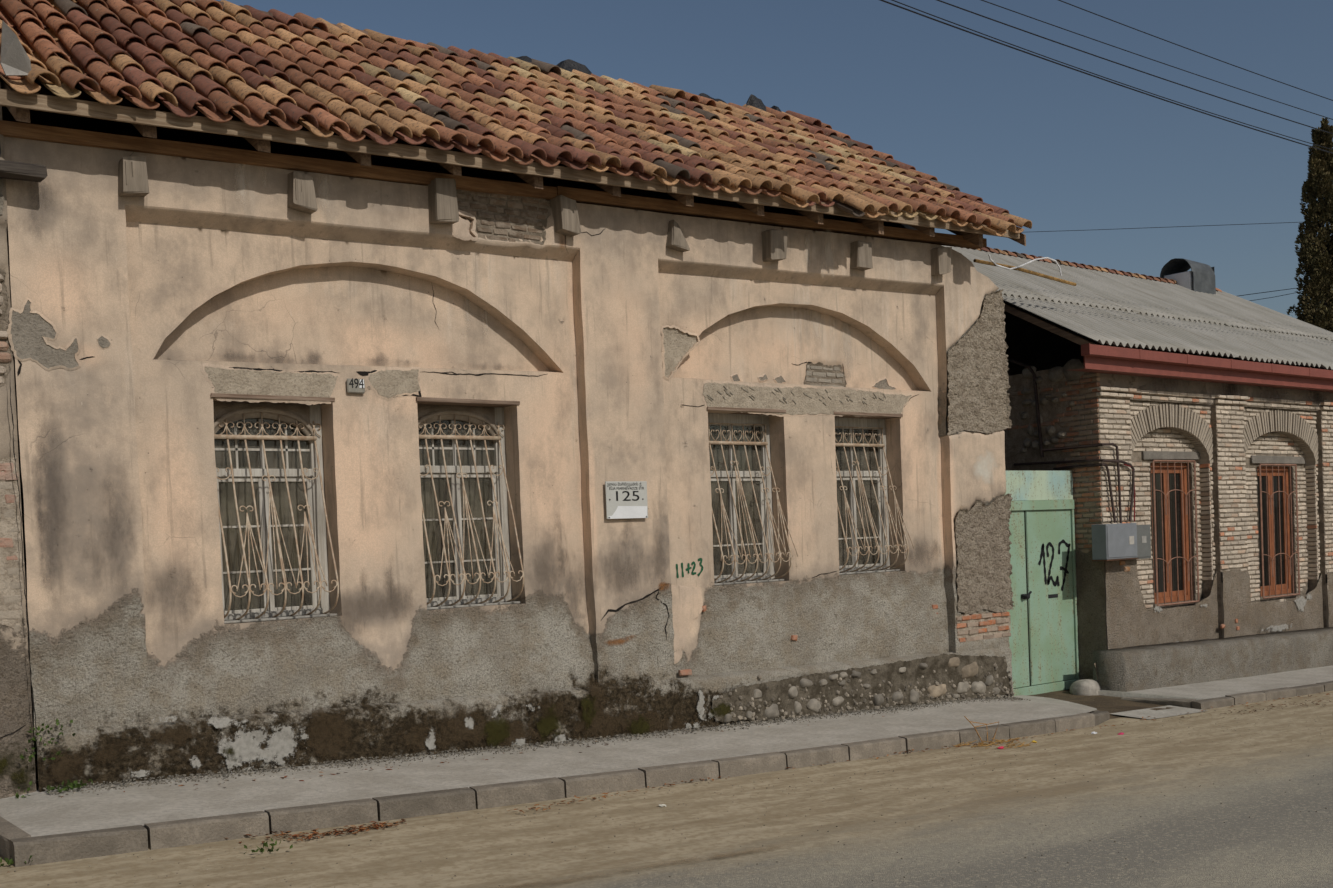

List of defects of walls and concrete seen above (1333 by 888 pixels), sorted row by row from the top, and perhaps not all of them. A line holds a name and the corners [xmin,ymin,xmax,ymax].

flaking render [448,189,552,244]
flaking render [0,269,81,386]
flaking render [97,335,112,350]
flaking render [946,289,1012,435]
crack [601,588,669,638]
spalling [711,493,1015,726]
damp [394,680,697,751]